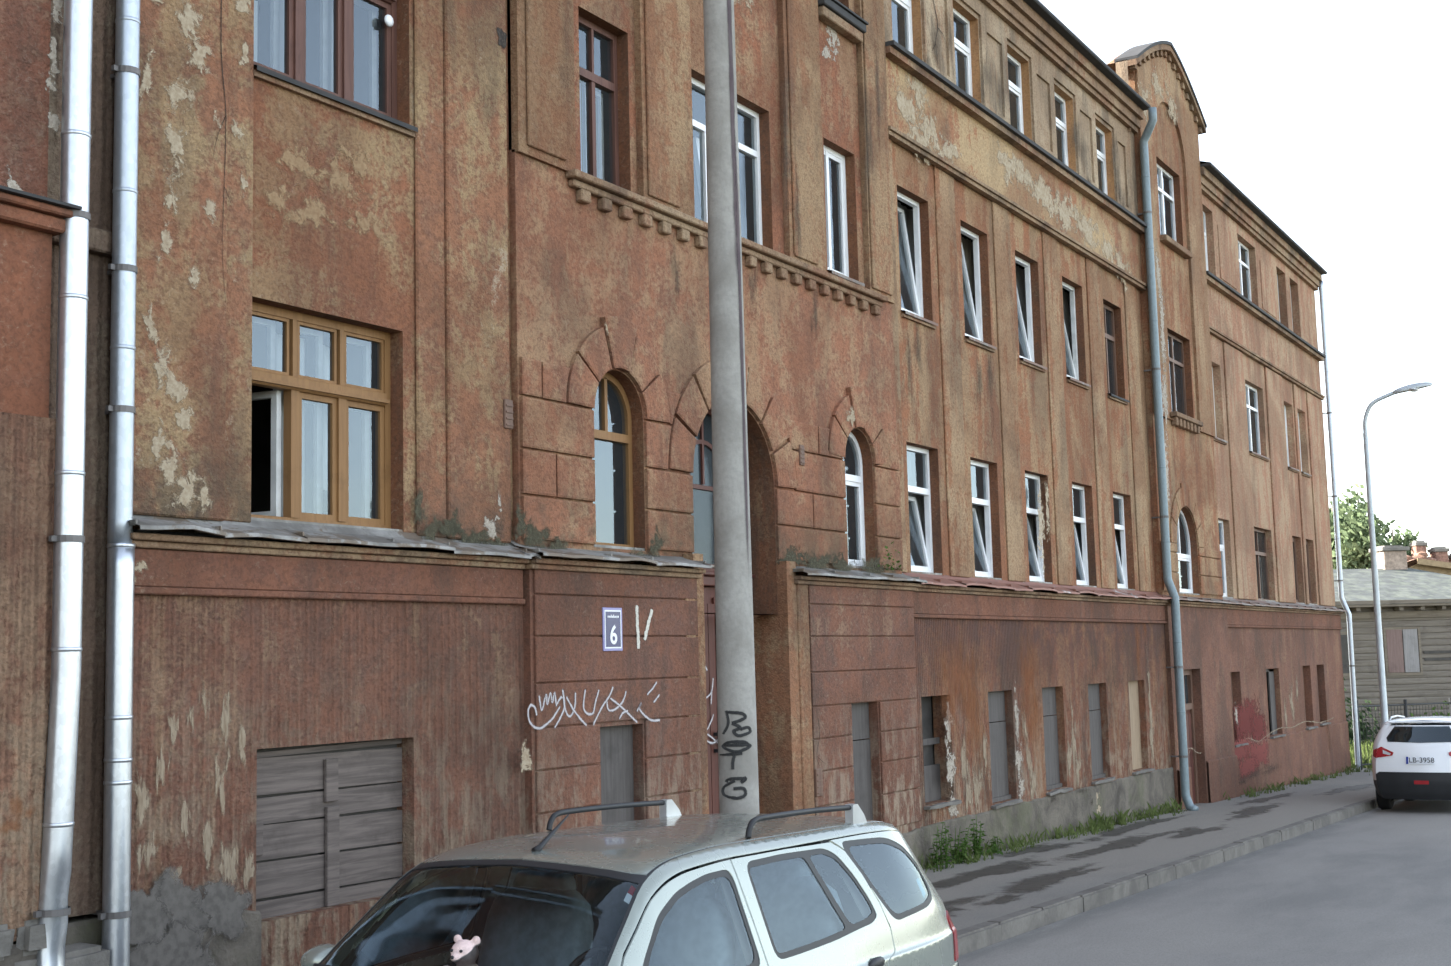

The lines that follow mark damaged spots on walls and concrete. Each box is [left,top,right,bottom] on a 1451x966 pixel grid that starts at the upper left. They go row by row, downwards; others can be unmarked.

peeling [236,0,251,13]
peeling [239,42,249,66]
peeling [139,0,212,261]
peeling [892,73,962,165]
peeling [203,200,216,224]
peeling [997,141,1132,293]
peeling [188,268,200,289]
peeling [142,305,213,512]
damp [414,488,568,551]
spalling [944,703,988,816]
spalling [1014,682,1037,801]
spalling [130,684,255,966]